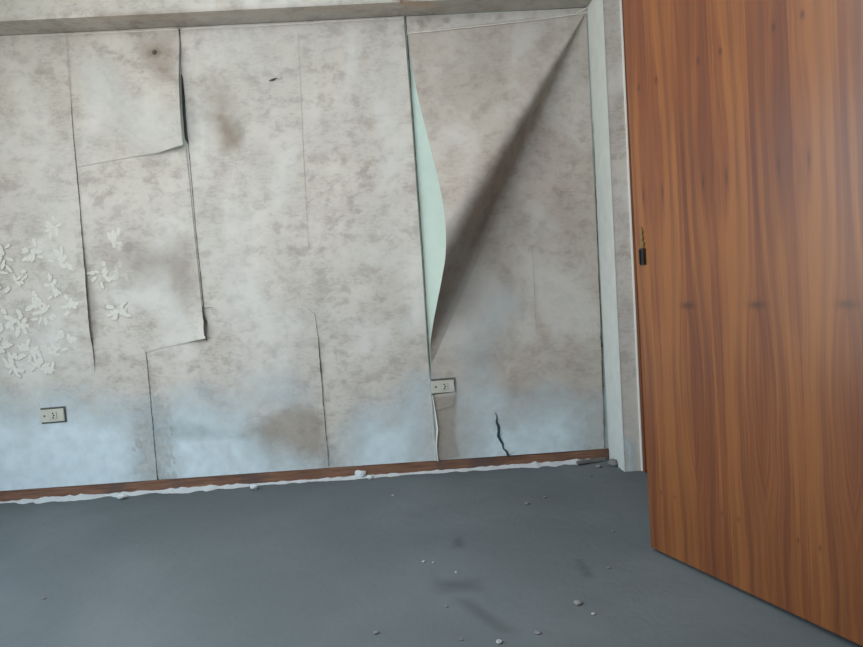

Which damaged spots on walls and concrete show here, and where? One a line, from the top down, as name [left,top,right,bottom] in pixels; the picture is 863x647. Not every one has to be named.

crack [495,412,514,456]